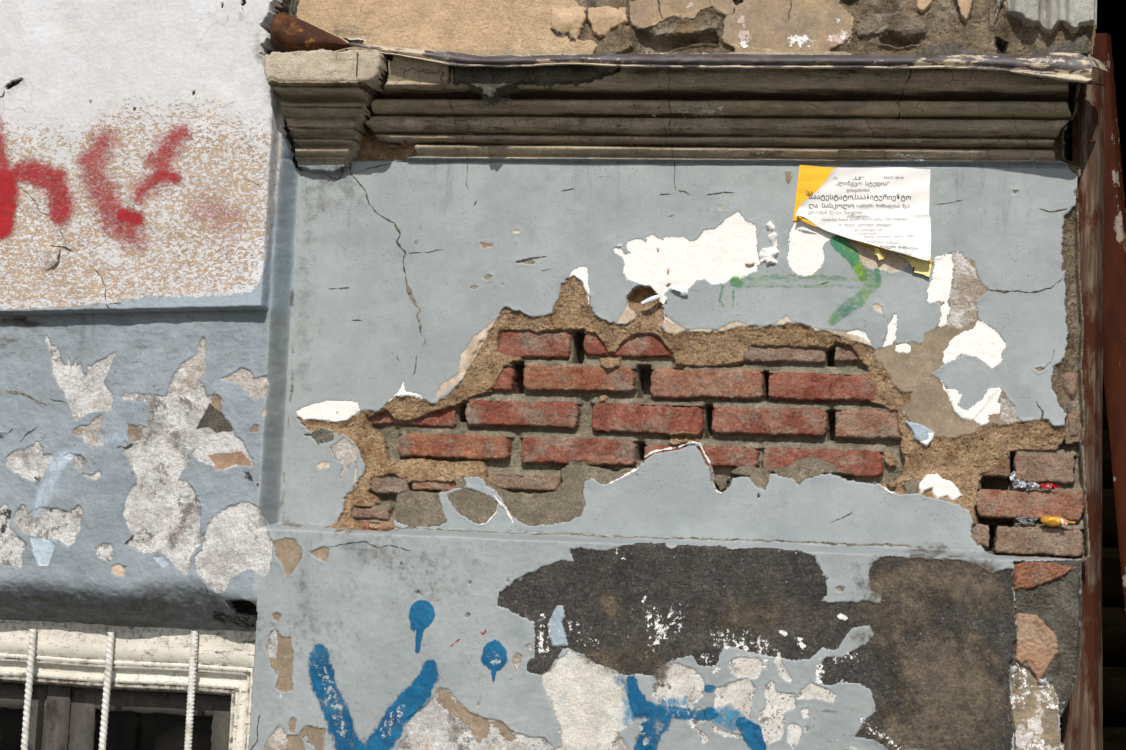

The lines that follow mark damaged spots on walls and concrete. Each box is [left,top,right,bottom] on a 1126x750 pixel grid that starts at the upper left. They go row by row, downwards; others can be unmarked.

spalling [550,0,1097,56]
crack [284,119,444,376]
spalling [297,82,1091,750]
peeling [5,441,54,481]
peeling [45,335,330,592]
peeling [0,503,83,568]
peeling [266,613,294,692]
peeling [264,662,347,750]